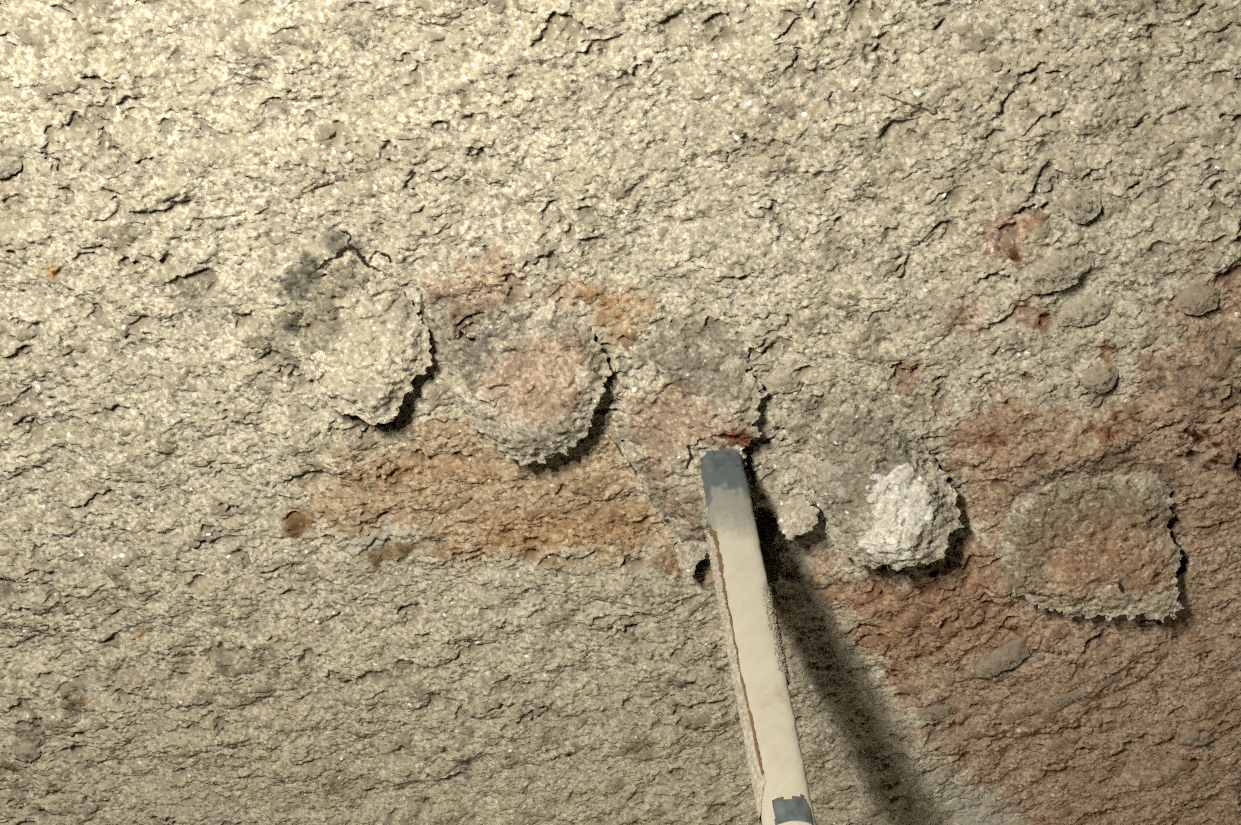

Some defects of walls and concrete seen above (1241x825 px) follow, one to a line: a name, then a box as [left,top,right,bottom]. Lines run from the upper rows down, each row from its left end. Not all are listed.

peeling [452,301,768,580]
peeling [759,538,784,604]
peeling [776,396,964,571]
rust [1178,428,1223,469]